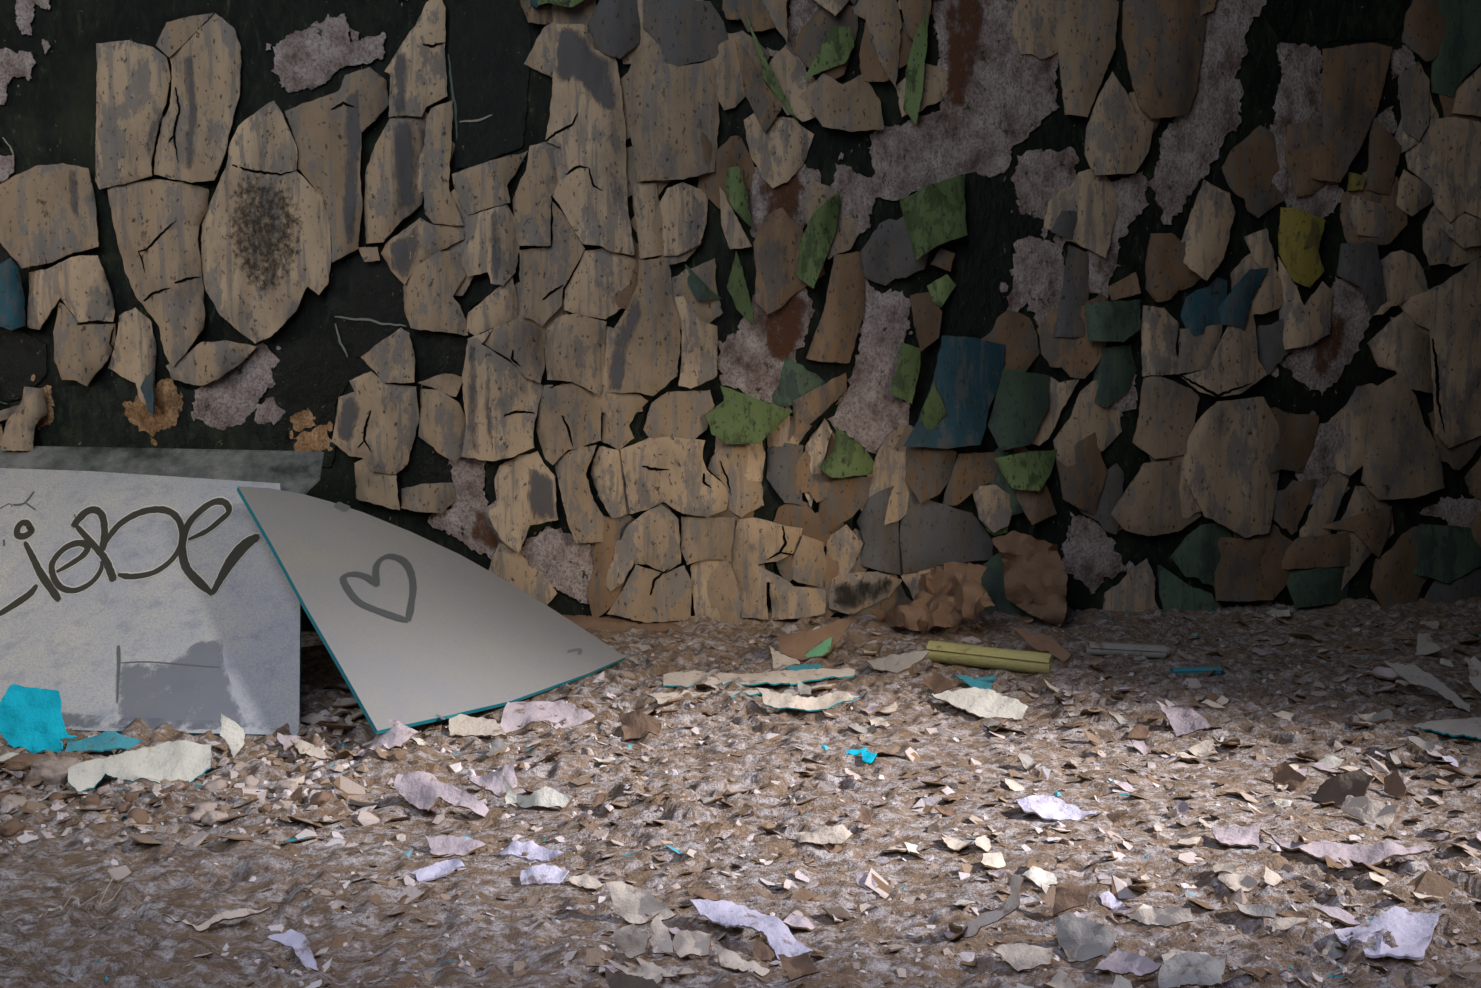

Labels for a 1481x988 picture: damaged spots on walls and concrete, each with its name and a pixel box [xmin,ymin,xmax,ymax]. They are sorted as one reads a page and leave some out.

crack [138,221,200,301]
damp [226,178,301,290]
peeling [0,0,1481,740]